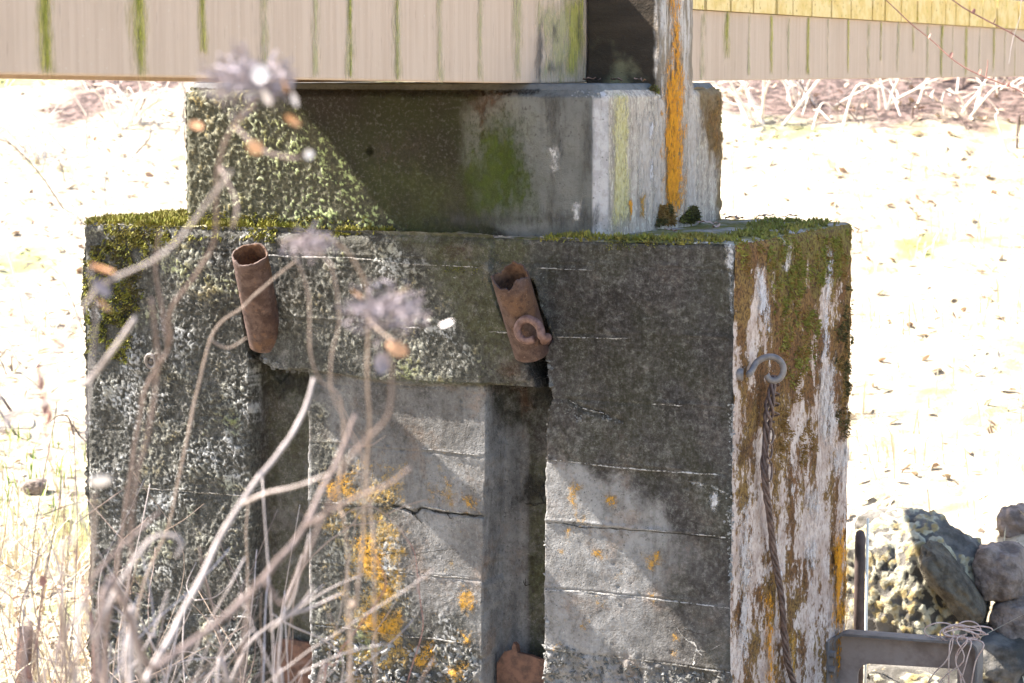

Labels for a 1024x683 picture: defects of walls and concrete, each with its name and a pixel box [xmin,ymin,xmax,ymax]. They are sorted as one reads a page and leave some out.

crack [319,502,484,523]